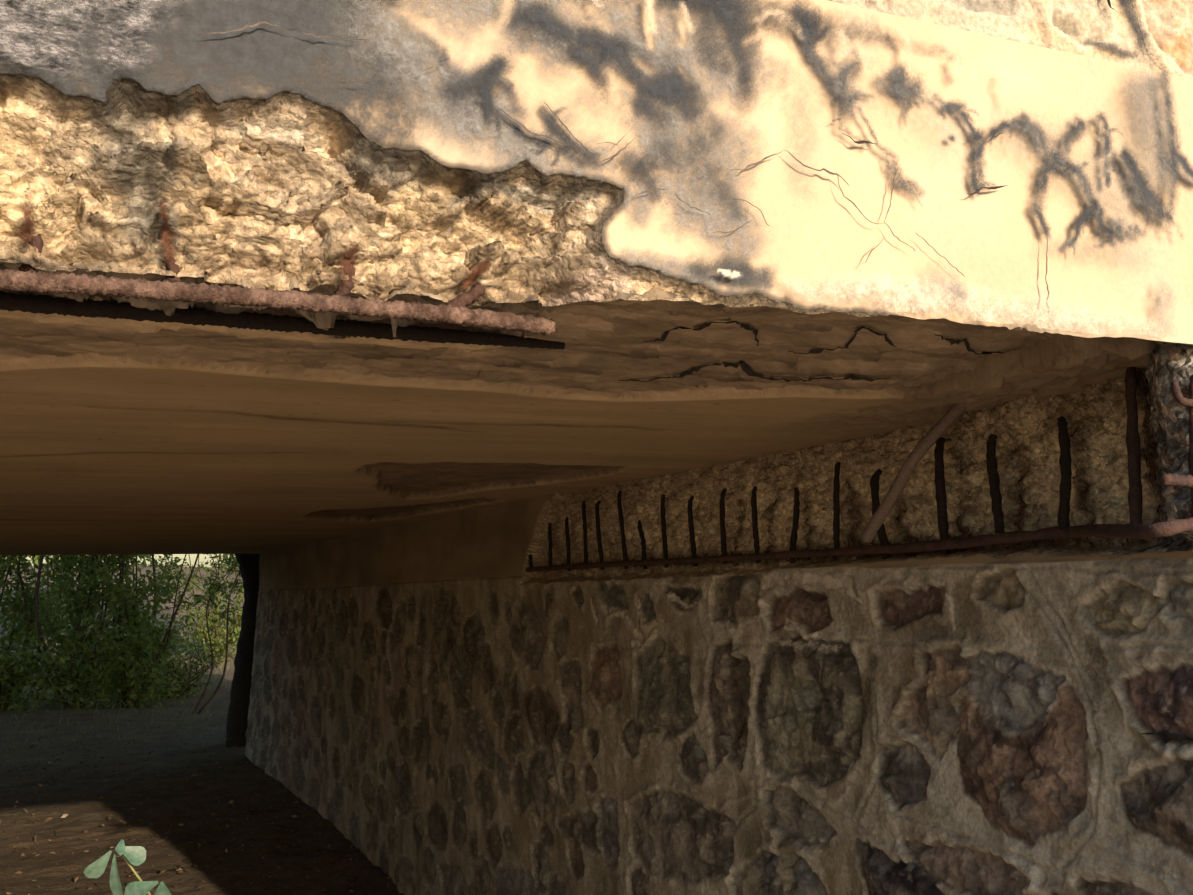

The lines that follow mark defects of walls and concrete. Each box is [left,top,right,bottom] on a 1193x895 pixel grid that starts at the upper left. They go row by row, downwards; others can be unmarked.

peeling [646,0,656,33]
crack [842,133,875,144]
corrosion [156,199,176,261]
crack [732,149,965,277]
crack [969,185,1008,195]
corrosion [341,245,360,281]
corrosion [461,258,492,289]
crack [1043,239,1051,313]
spalling [0,74,1193,584]
crack [618,321,897,382]
corrosion [1136,373,1166,522]
corrosion [895,425,1162,556]